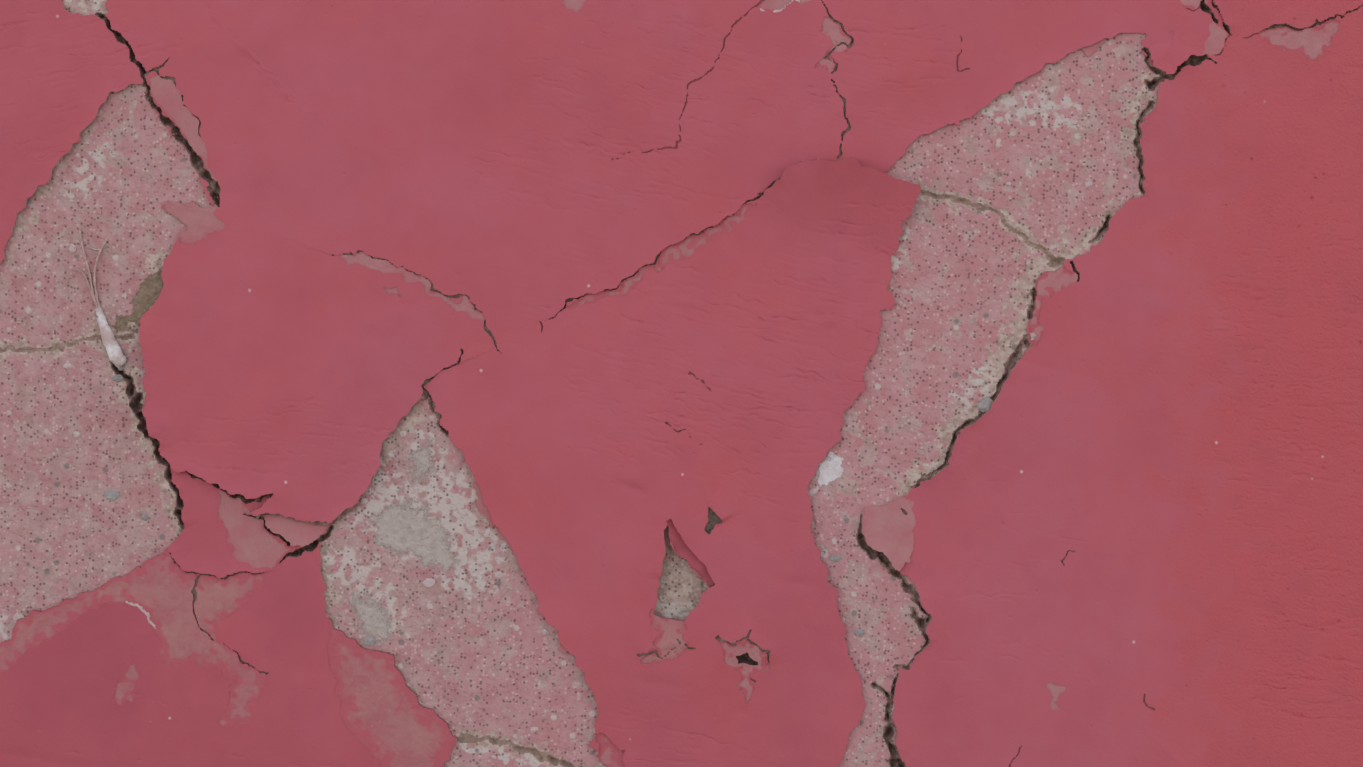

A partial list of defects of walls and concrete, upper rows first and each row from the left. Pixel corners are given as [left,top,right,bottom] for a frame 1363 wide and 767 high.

spalling [62,0,108,16]
crack [95,12,221,207]
crack [821,0,854,159]
crack [1133,0,1363,195]
spalling [0,84,267,728]
crack [539,178,780,332]
crack [901,189,1112,515]
spalling [808,0,1213,767]
spalling [320,396,625,767]
peeling [637,519,715,664]
peeling [715,630,771,704]
crack [856,514,932,767]